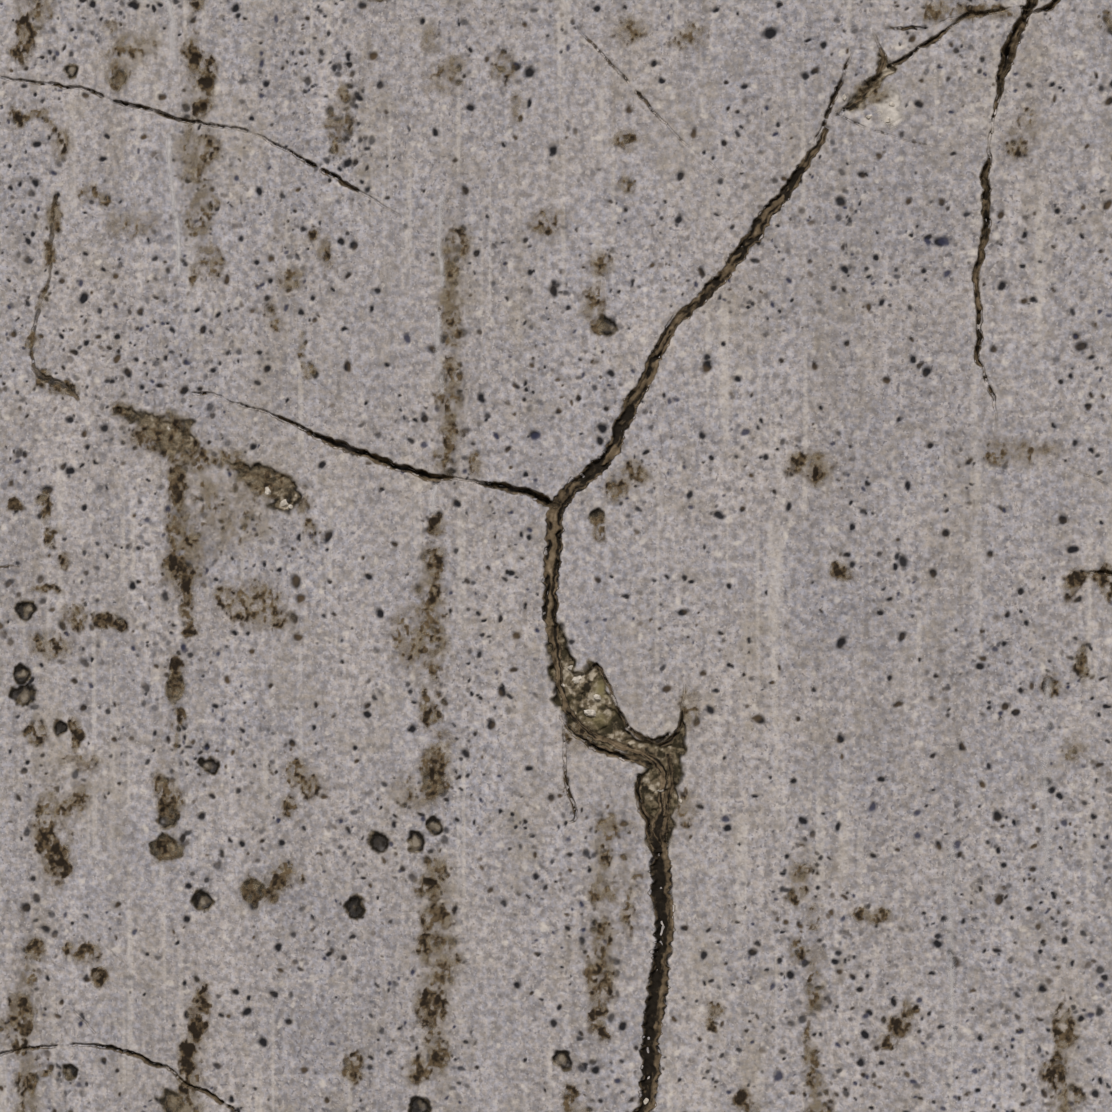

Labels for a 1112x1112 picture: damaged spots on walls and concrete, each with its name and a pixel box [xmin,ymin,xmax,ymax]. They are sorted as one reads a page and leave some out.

crack [7,77,371,199]
crack [30,195,80,401]
crack [243,0,1060,1112]
crack [1,1017,239,1112]